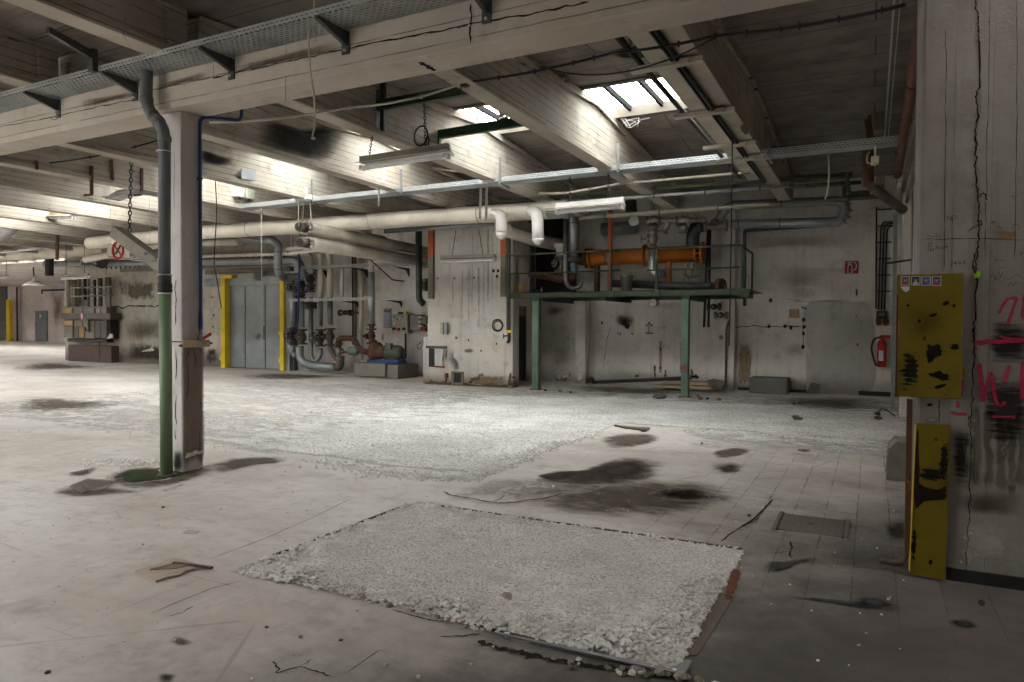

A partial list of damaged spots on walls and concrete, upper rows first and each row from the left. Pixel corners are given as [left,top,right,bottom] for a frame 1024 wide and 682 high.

crack [155,1,588,90]
crack [937,0,1018,569]
water stain [954,383,1024,511]